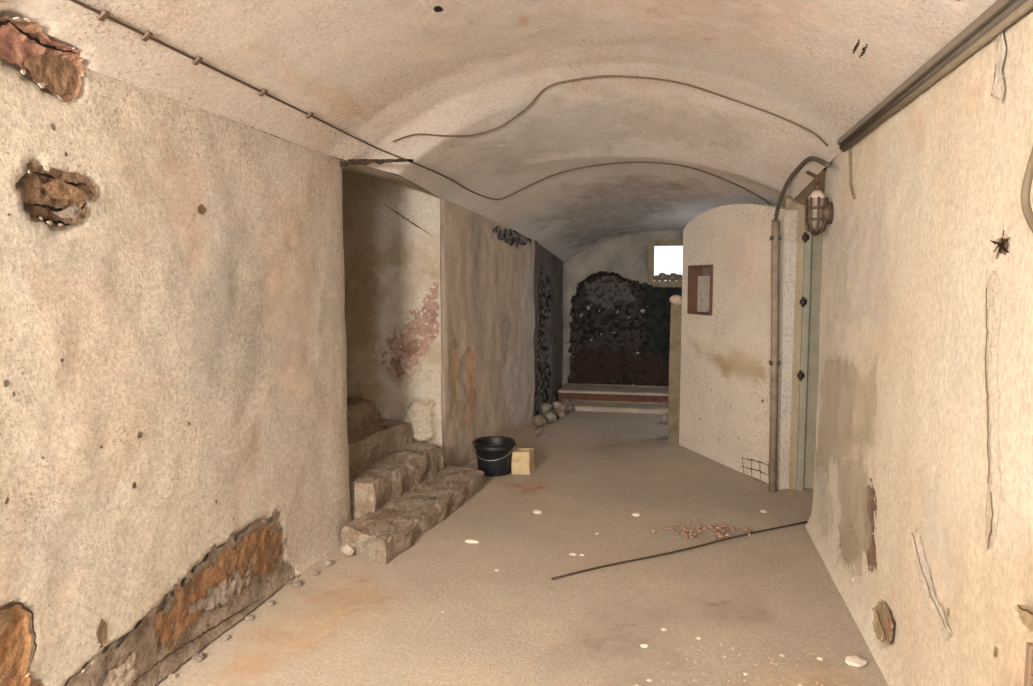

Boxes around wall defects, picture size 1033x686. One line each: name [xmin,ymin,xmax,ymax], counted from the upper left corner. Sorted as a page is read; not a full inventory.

flaking render [0,602,43,686]
flaking render [66,508,299,686]